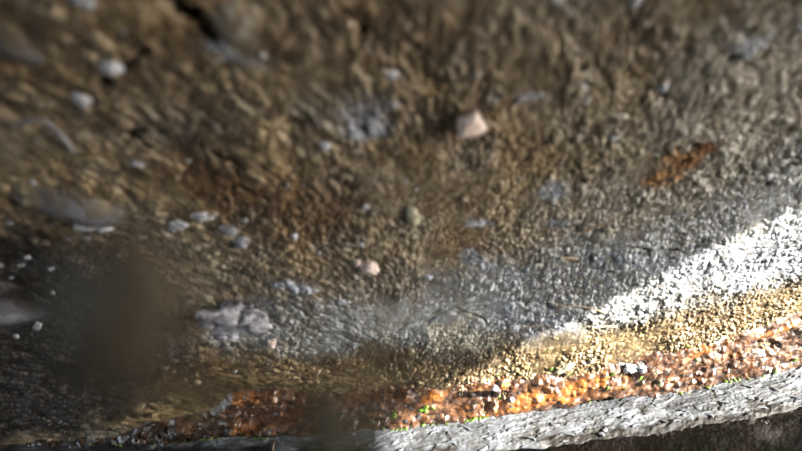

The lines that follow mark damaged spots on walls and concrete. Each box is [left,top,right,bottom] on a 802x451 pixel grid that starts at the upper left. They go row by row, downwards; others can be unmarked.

corrosion [640,140,717,187]
corrosion [354,312,802,430]
corrosion [25,387,303,449]